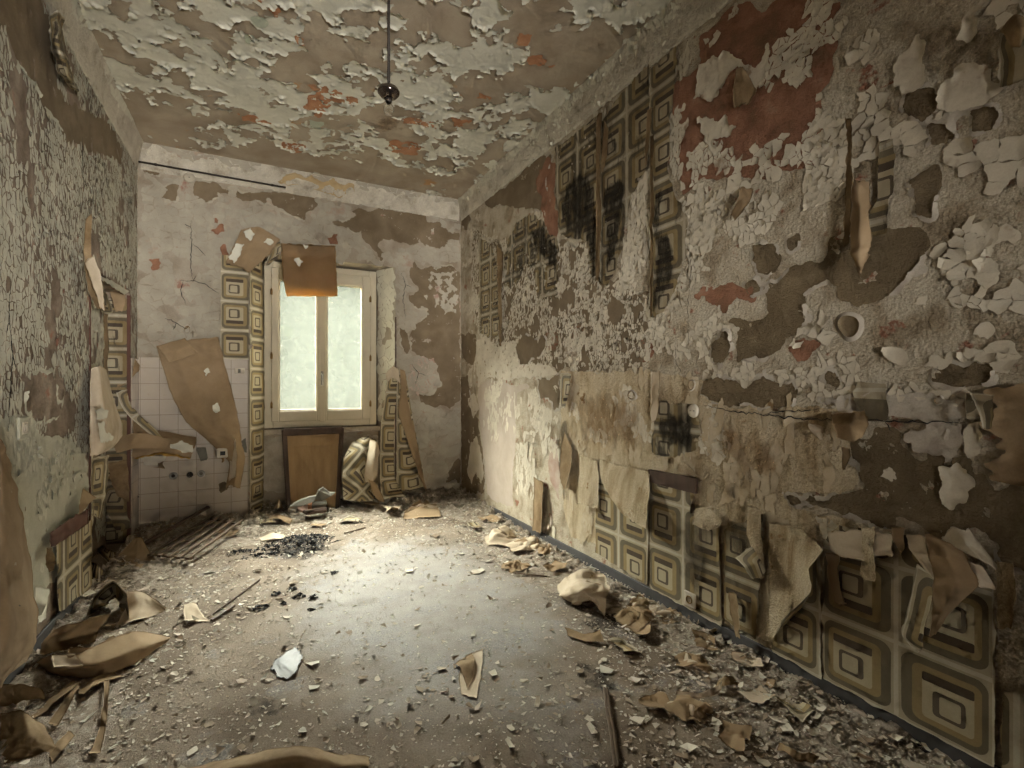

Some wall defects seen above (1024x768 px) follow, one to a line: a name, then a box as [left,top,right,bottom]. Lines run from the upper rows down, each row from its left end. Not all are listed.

peeling [956,0,1024,43]
peeling [851,34,1024,223]
crack [165,224,216,330]
peeling [0,0,931,623]
mould [532,226,558,279]
mould [561,174,625,272]
mould [653,193,673,311]
peeling [929,214,1024,315]
mould [659,413,691,449]
crack [708,405,830,421]
crack [869,419,965,433]
spalling [887,322,1022,408]